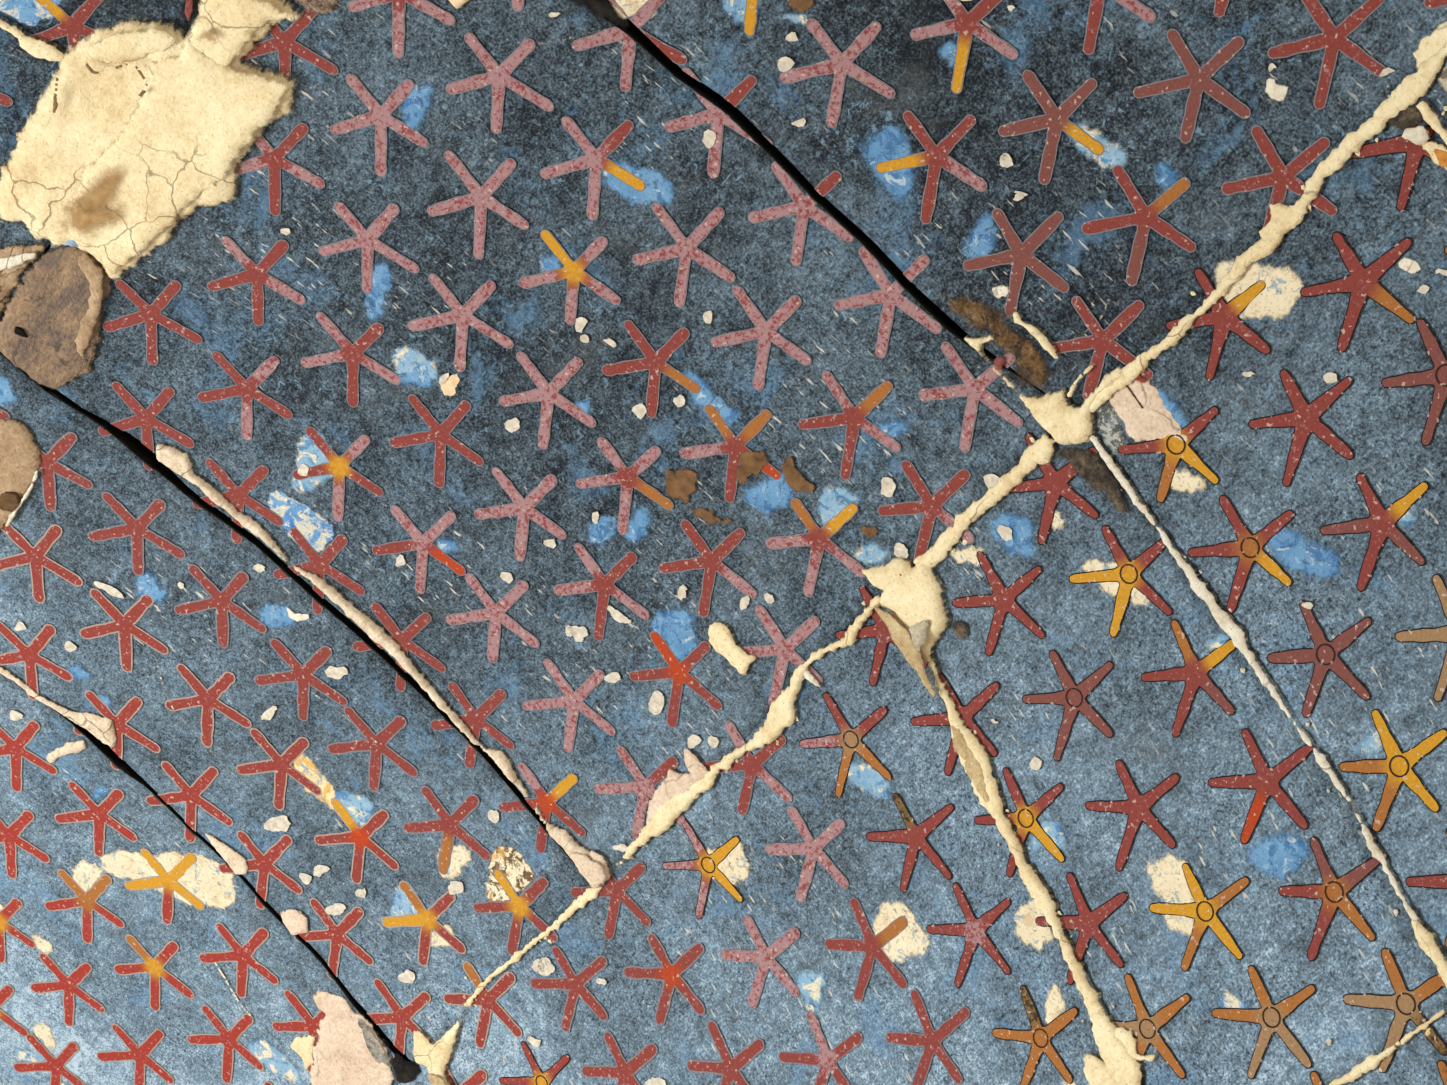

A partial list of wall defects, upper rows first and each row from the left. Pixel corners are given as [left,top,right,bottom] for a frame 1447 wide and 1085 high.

peeling [613,0,655,19]
spalling [1413,21,1447,91]
spalling [0,240,112,529]
crack [0,242,565,851]
crack [463,0,1447,1007]
spalling [0,667,117,763]
peeling [72,834,248,910]
crack [3,669,411,1062]
crack [928,661,1155,1085]
spalling [280,909,308,935]
spalling [248,990,419,1085]
crack [1329,1010,1444,1085]